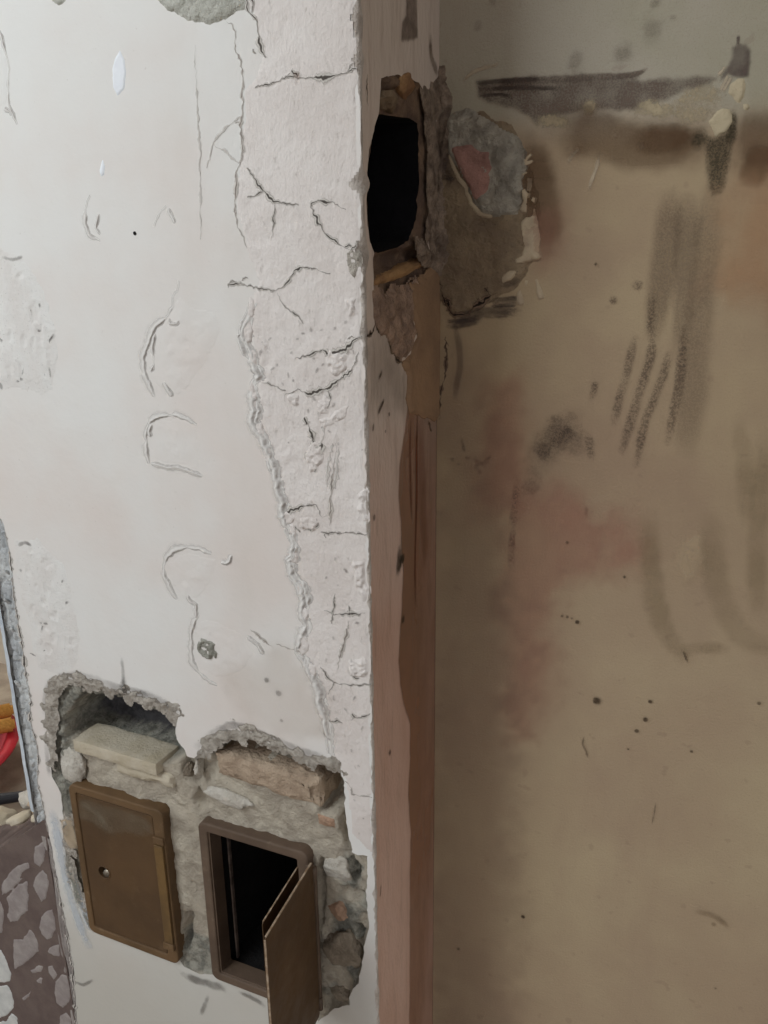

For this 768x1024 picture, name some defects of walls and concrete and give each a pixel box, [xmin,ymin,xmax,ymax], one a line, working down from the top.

damp [564,70,643,81]
crack [194,0,368,253]
damp [525,157,555,235]
damp [693,114,736,190]
crack [228,266,330,323]
peeling [502,189,543,306]
crack [266,324,404,538]
flaking render [0,0,493,1024]
crack [252,631,300,652]
crack [320,595,371,694]